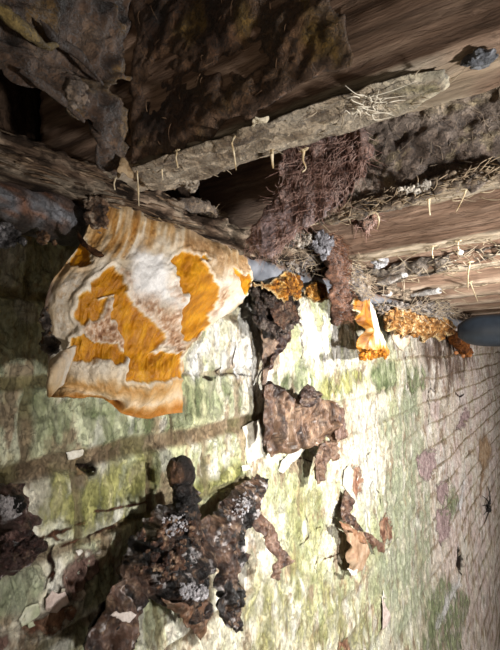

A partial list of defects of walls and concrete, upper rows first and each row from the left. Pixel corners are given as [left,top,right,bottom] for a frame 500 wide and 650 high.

peeling [278,445,315,473]
spalling [379,513,393,547]
spalling [0,525,45,571]
spalling [132,516,203,590]
peeling [110,611,136,623]